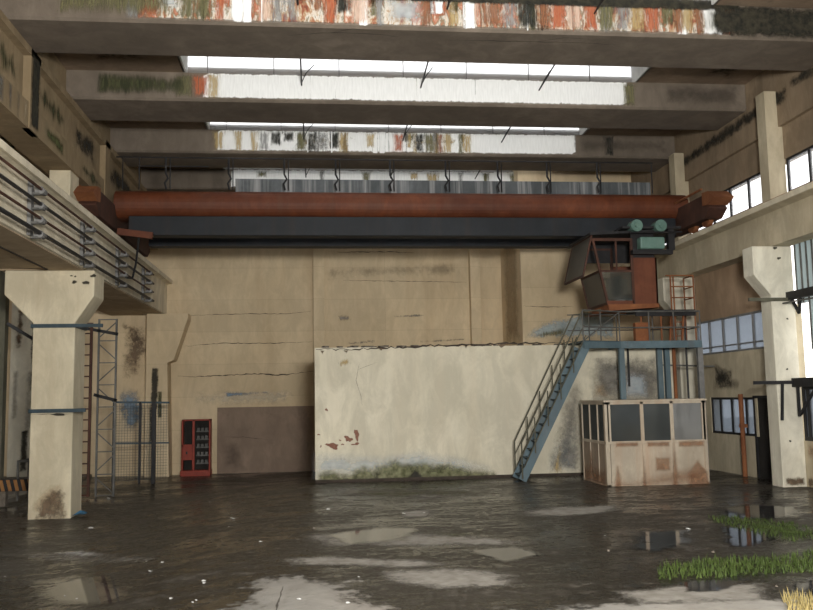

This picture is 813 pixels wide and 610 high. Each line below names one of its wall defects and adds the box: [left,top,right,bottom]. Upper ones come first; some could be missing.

leakage [60,0,168,14]
leakage [399,0,813,38]
leakage [99,73,635,105]
leakage [684,108,757,165]
peeling [320,430,359,450]
leakage [0,453,813,610]